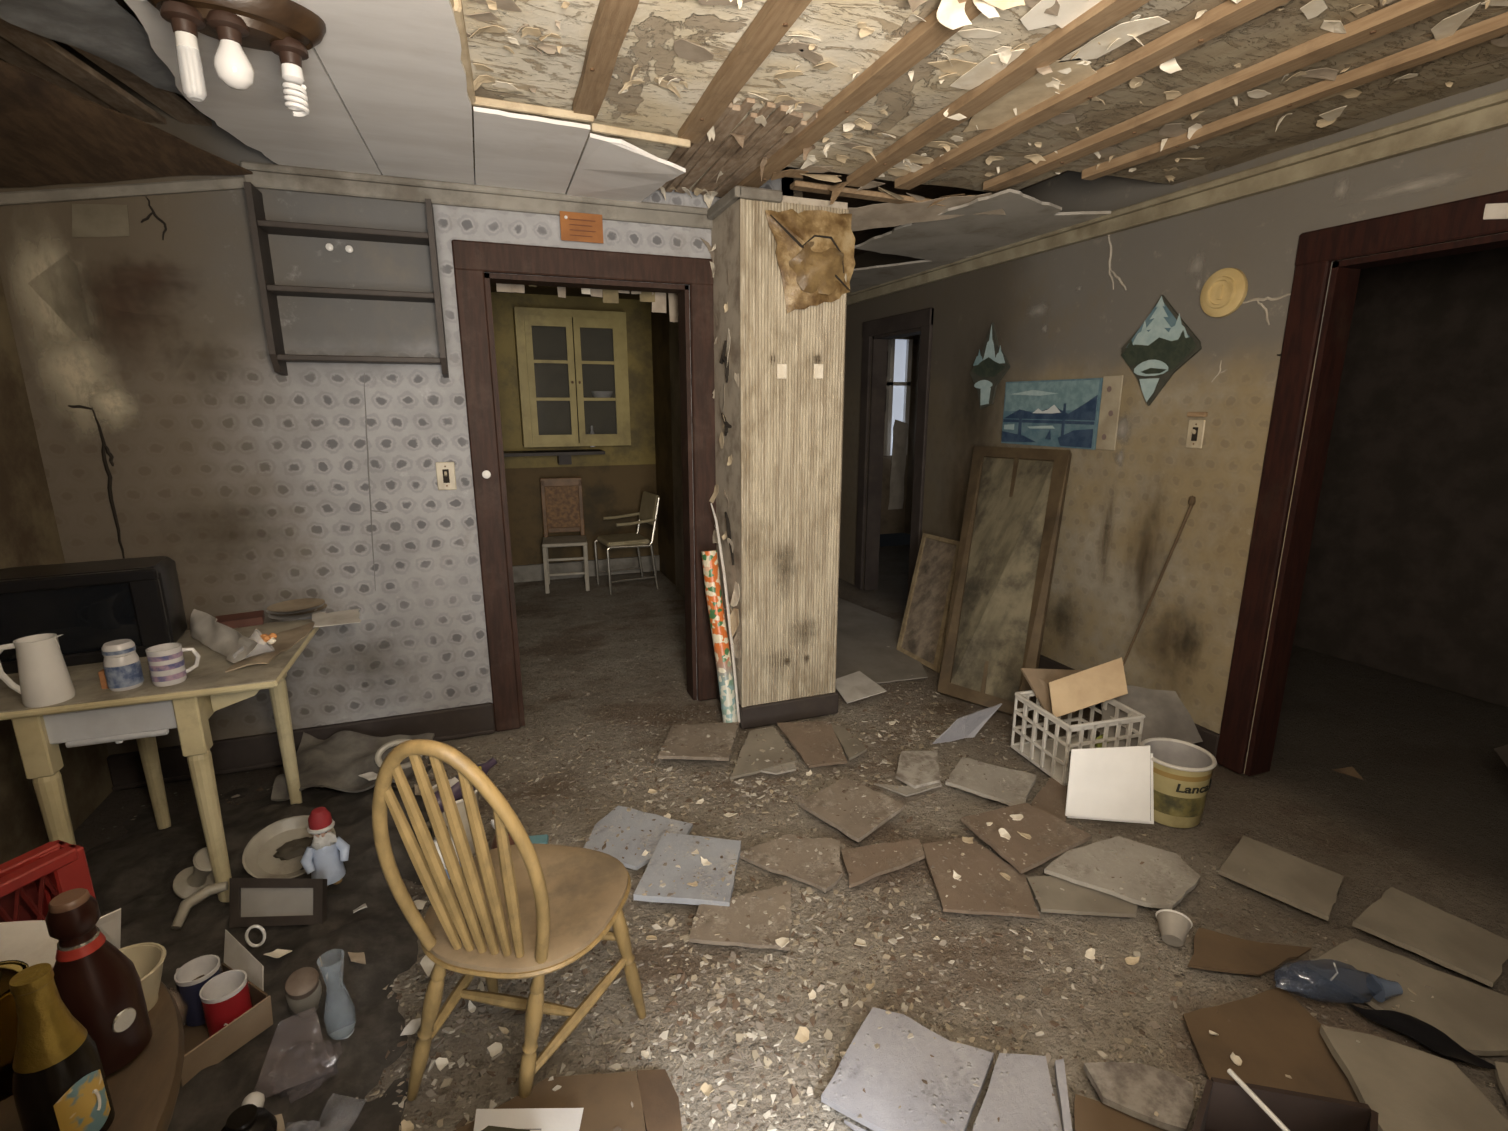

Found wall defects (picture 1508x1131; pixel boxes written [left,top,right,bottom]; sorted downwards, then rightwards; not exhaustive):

peeling [466,0,570,54]
peeling [698,0,753,9]
peeling [908,0,1102,90]
peeling [1277,0,1394,33]
peeling [1431,0,1508,40]
peeling [473,63,537,93]
peeling [618,65,688,98]
flaking render [657,15,1170,208]
peeling [1160,58,1182,100]
peeling [1232,67,1363,128]
peeling [1159,111,1205,183]